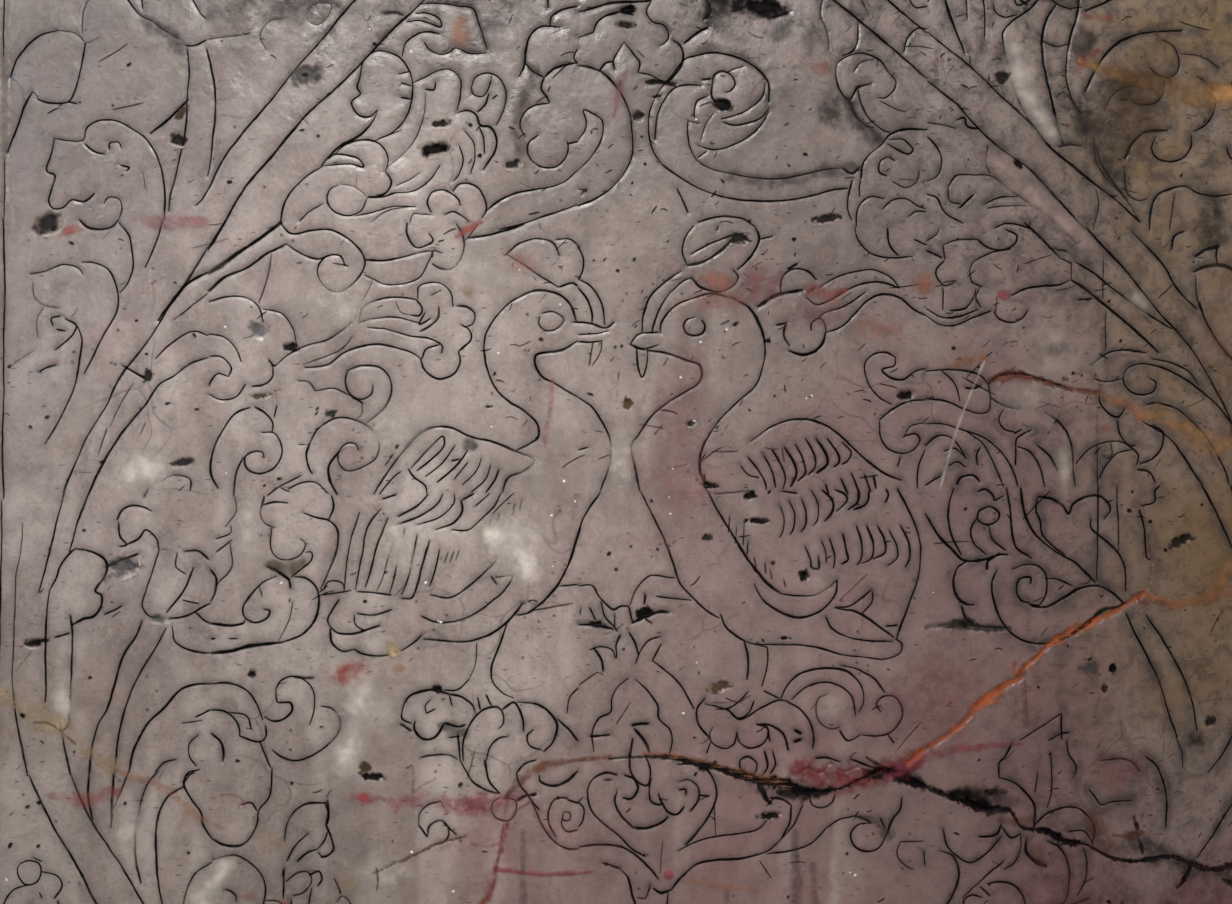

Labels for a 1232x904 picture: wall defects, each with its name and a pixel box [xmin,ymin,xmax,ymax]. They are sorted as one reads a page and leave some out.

crack [504,590,1232,889]